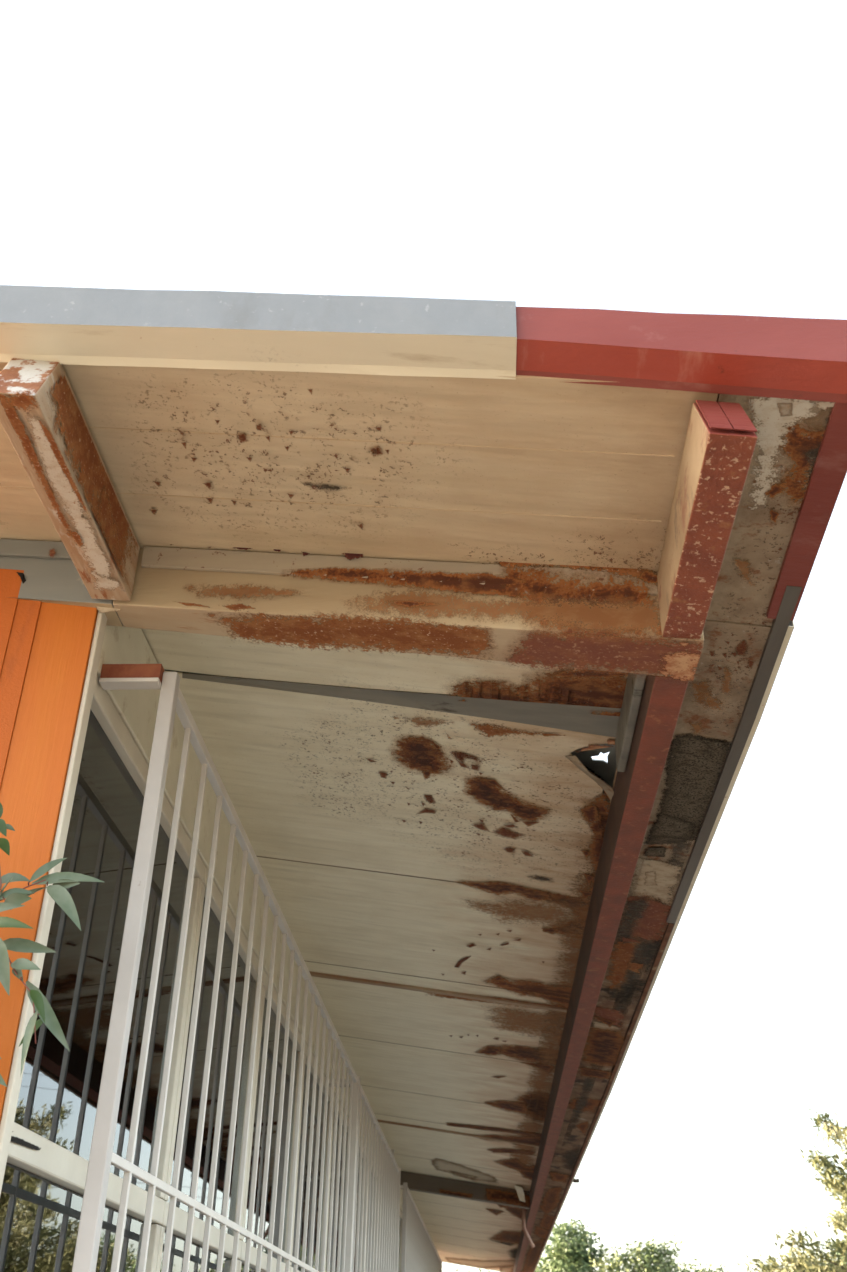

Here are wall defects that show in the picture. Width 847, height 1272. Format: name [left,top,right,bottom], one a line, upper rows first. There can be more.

peeling [27,414,125,592]
rust [149,384,413,516]
rust [735,424,825,590]
rust [178,528,767,733]
rust [286,707,610,1272]
rust [580,1007,626,1079]
rust [605,895,672,989]
water stain [431,1158,498,1183]